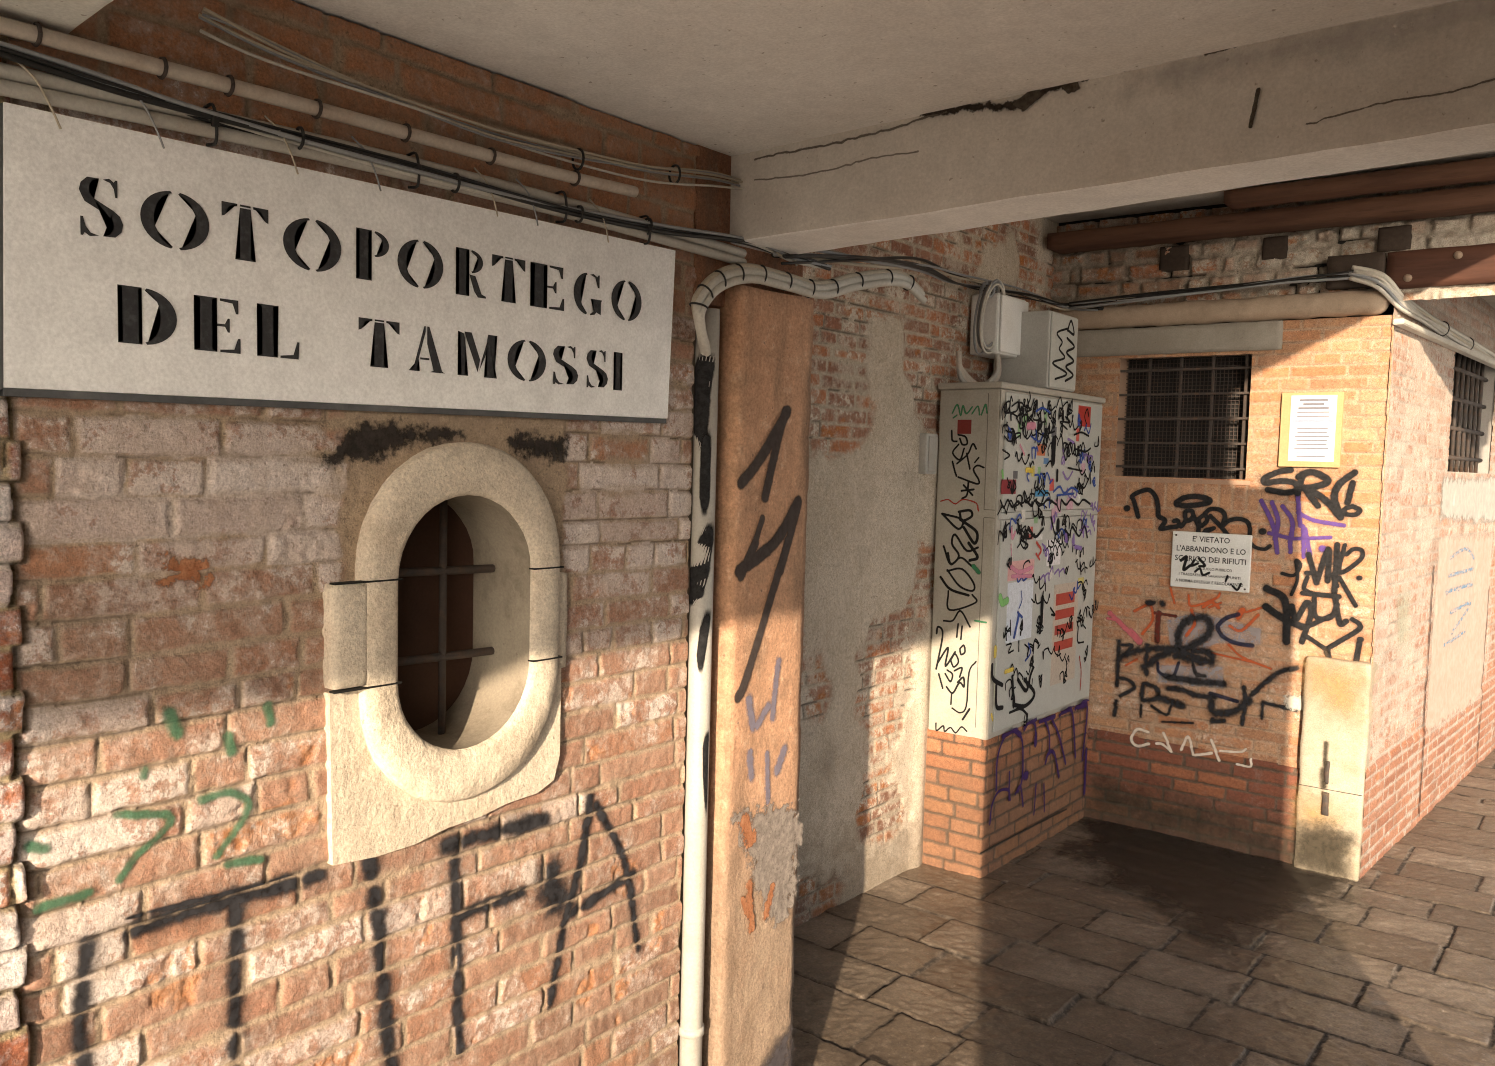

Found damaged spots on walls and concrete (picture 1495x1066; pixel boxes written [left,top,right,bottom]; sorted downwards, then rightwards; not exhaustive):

flaking render [1012,90,1043,112]
flaking render [1061,82,1080,94]
crack [1306,78,1495,125]
crack [754,79,1089,180]
peeling [730,799,803,934]